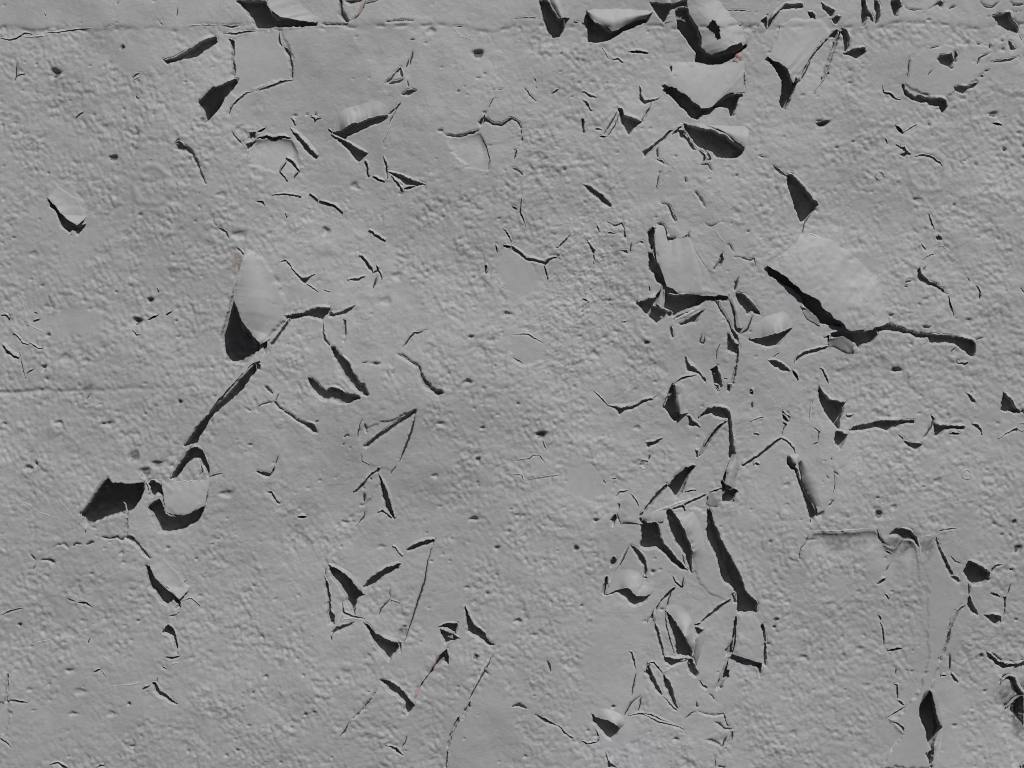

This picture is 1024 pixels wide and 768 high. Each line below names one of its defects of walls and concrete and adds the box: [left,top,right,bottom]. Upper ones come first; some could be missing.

peeling [244,0,378,25]
peeling [757,0,867,83]
peeling [233,117,318,157]
peeling [328,38,426,192]
peeling [583,0,819,205]
peeling [47,186,86,234]
peeling [766,215,983,379]
peeling [79,245,380,528]
crack [250,385,319,432]
peeling [592,202,922,747]
peeling [325,536,435,652]
peeling [950,554,1012,621]